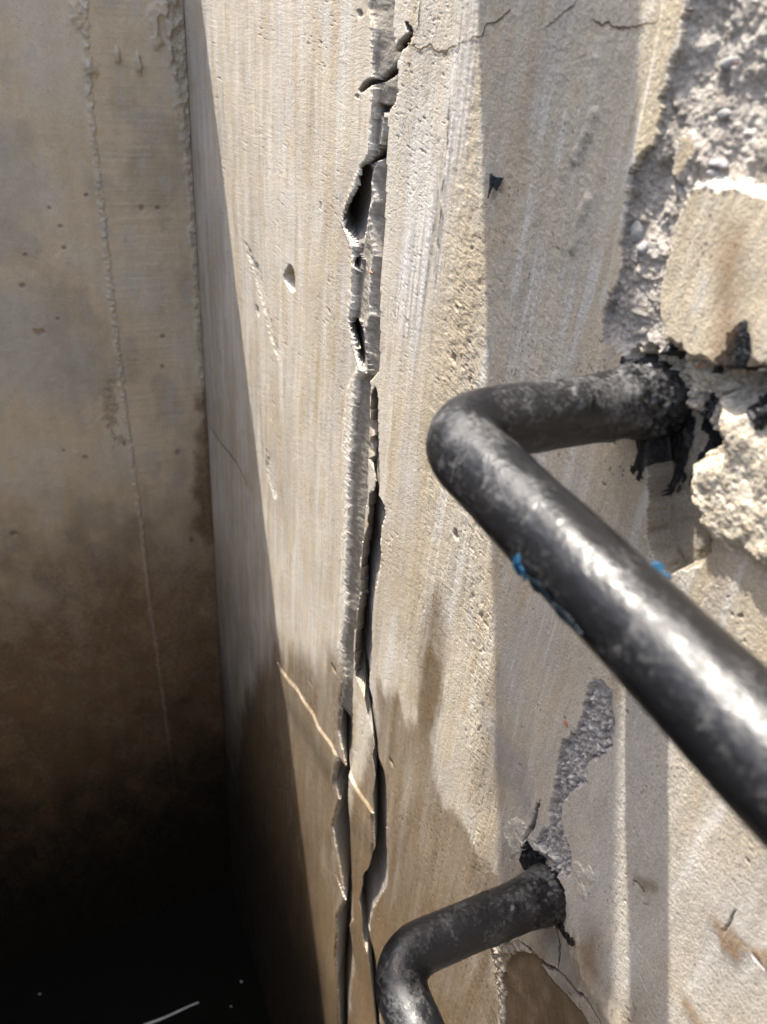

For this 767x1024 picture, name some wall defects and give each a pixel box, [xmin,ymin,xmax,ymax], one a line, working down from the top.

crack [332,0,510,1024]
spalling [504,678,616,901]
crack [545,0,659,29]
spalling [600,0,767,575]